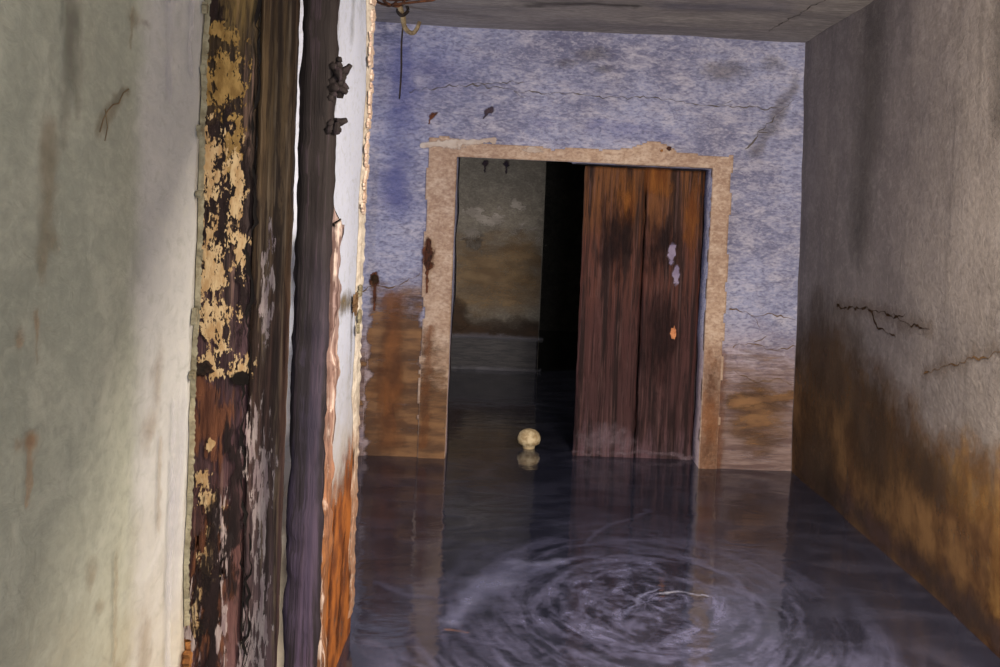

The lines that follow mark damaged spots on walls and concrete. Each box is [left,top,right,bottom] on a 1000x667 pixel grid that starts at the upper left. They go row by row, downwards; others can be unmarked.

peeling [181,0,257,667]
peeling [237,398,278,667]
peeling [258,216,276,348]
rust [325,445,355,667]
leakage [358,284,447,459]
leakage [716,354,835,495]
crack [837,304,927,336]
rust [792,341,1000,658]
crack [924,351,996,374]